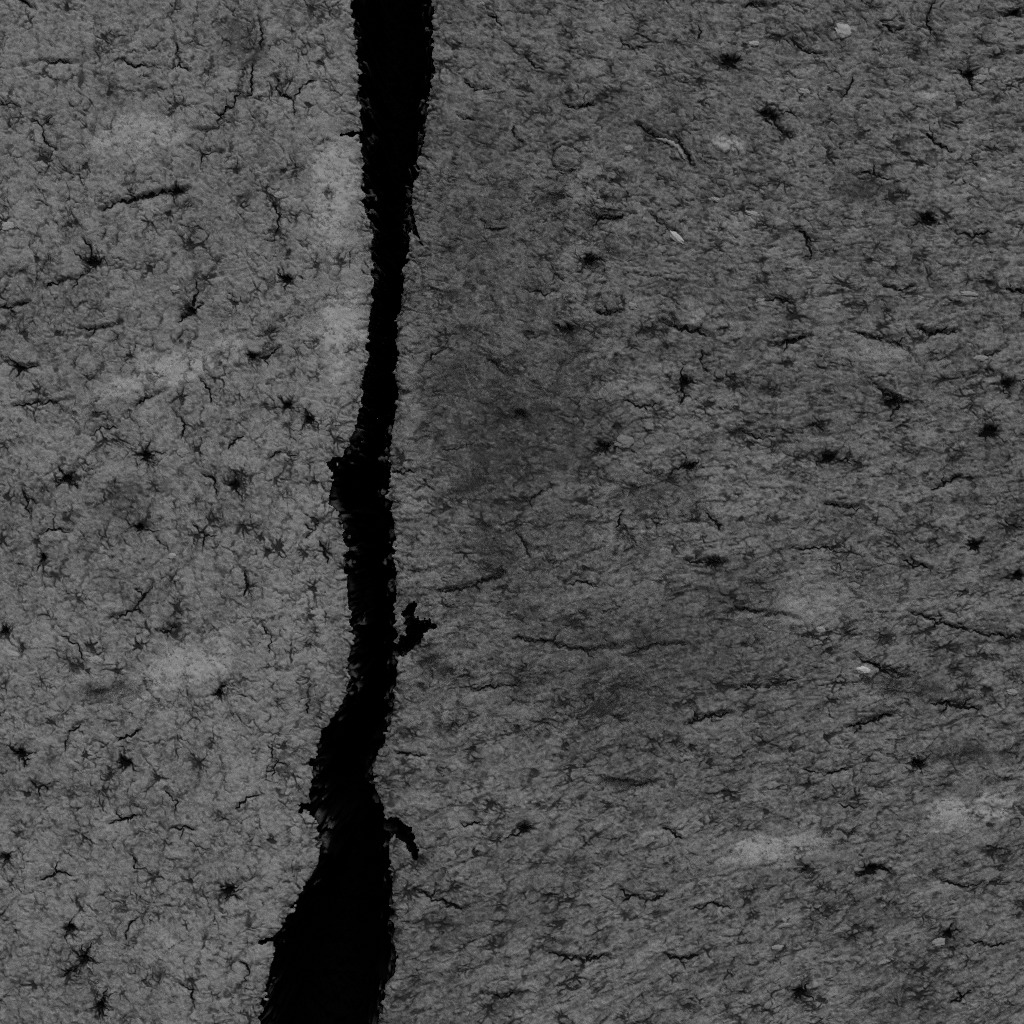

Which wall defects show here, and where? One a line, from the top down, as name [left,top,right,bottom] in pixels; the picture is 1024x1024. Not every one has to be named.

crack [102,188,180,211]
crack [422,350,442,371]
crack [235,0,437,1024]